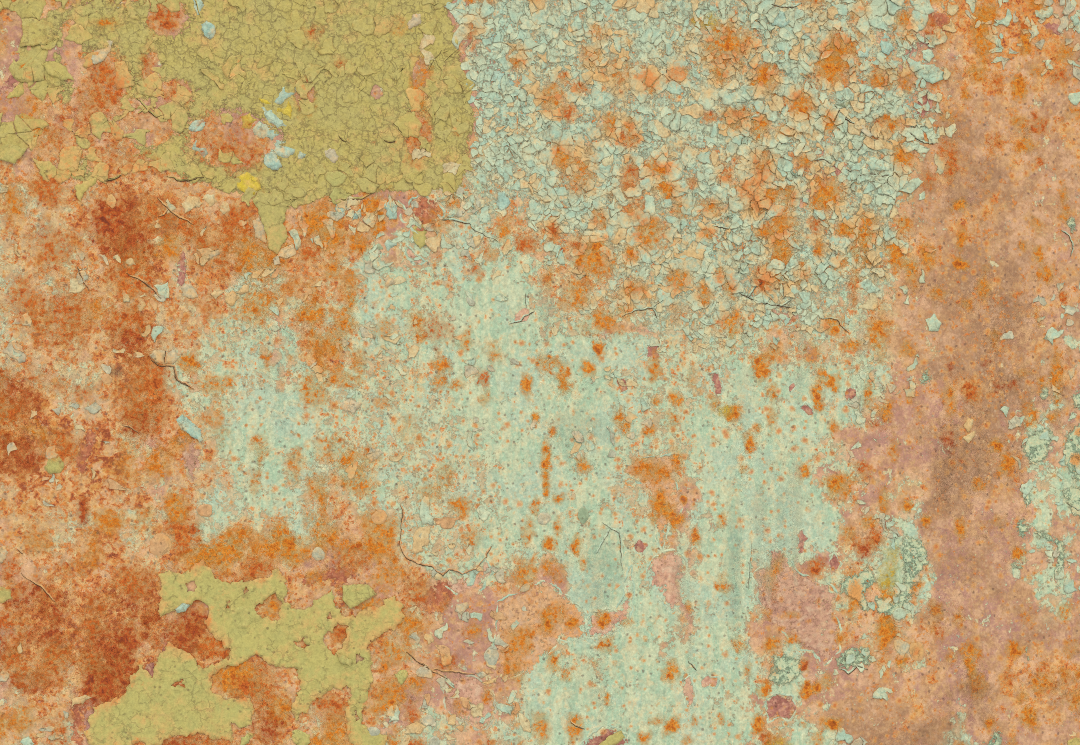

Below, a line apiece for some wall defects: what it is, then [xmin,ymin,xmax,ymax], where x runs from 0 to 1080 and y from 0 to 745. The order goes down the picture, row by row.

corrosion [0,557,291,744]
peeling [122,226,220,312]
corrosion [0,192,389,478]
crack [0,0,498,242]
corrosion [163,472,433,745]
peeling [20,452,688,745]
corrosion [523,427,563,544]
corrosion [520,307,629,394]
peeling [211,0,1080,443]
corrosion [634,454,700,543]
peeling [752,477,929,724]
peeling [1000,368,1080,516]